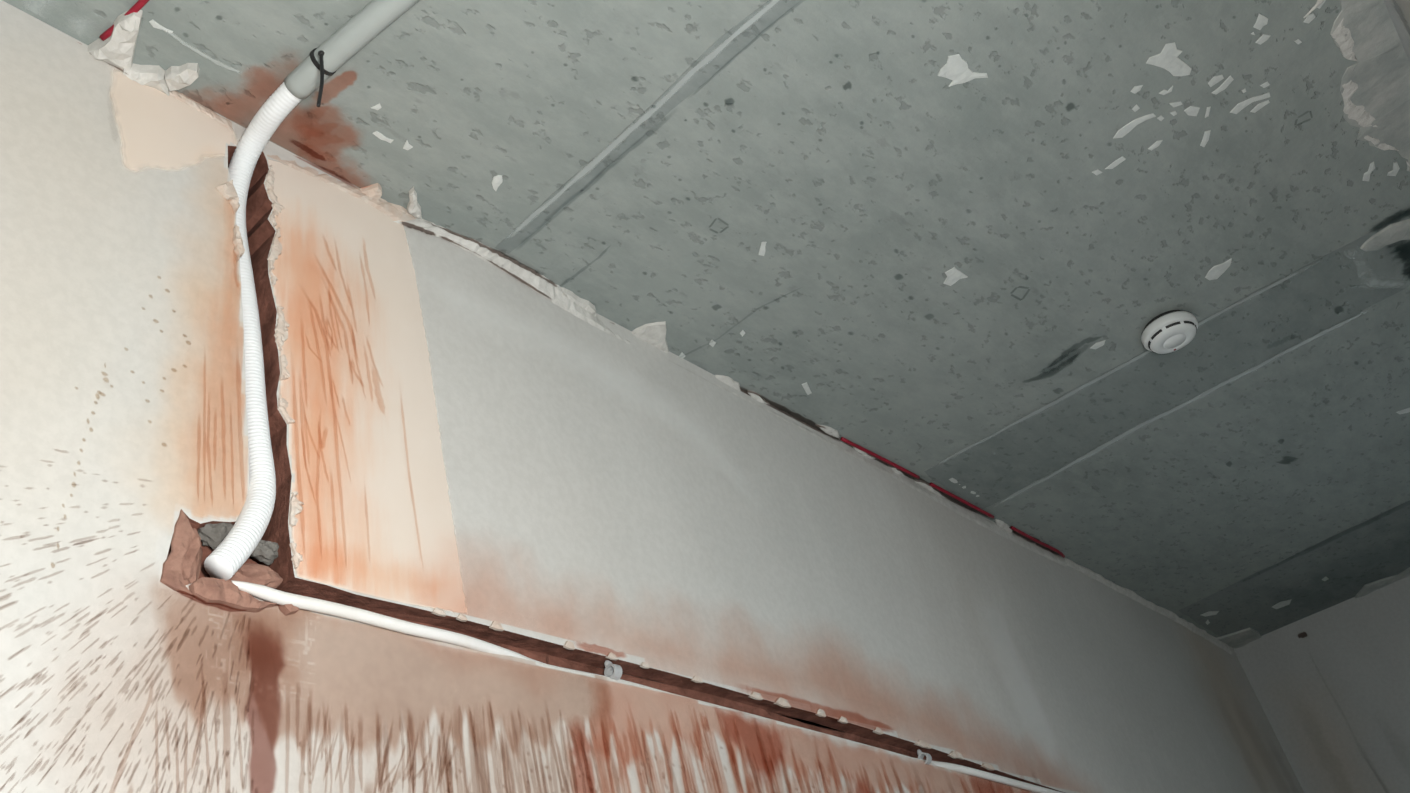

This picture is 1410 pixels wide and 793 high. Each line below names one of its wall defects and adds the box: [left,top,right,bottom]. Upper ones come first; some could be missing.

peeling [88,10,200,96]
peeling [1251,14,1271,45]
spalling [1303,0,1326,24]
spalling [1331,18,1357,61]
peeling [1113,42,1270,147]
spalling [1341,80,1410,181]
peeling [1092,156,1126,175]
spalling [1374,209,1410,230]
spalling [1393,242,1410,278]
peeling [189,577,299,616]